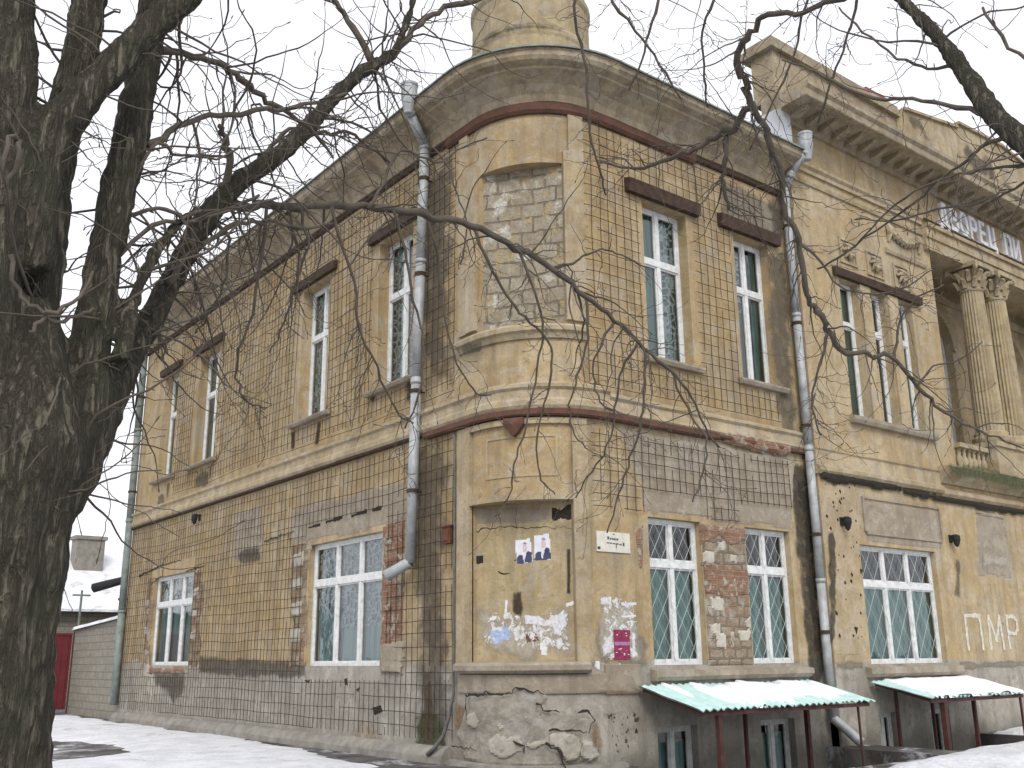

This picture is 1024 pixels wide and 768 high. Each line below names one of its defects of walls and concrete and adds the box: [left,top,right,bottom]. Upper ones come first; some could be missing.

spalling [723,433,791,456]
flaking render [288,540,312,670]
flaking render [380,520,405,646]
water stain [416,452,448,725]
flaking render [699,524,753,666]
crack [465,687,596,768]
flaking render [457,689,639,766]